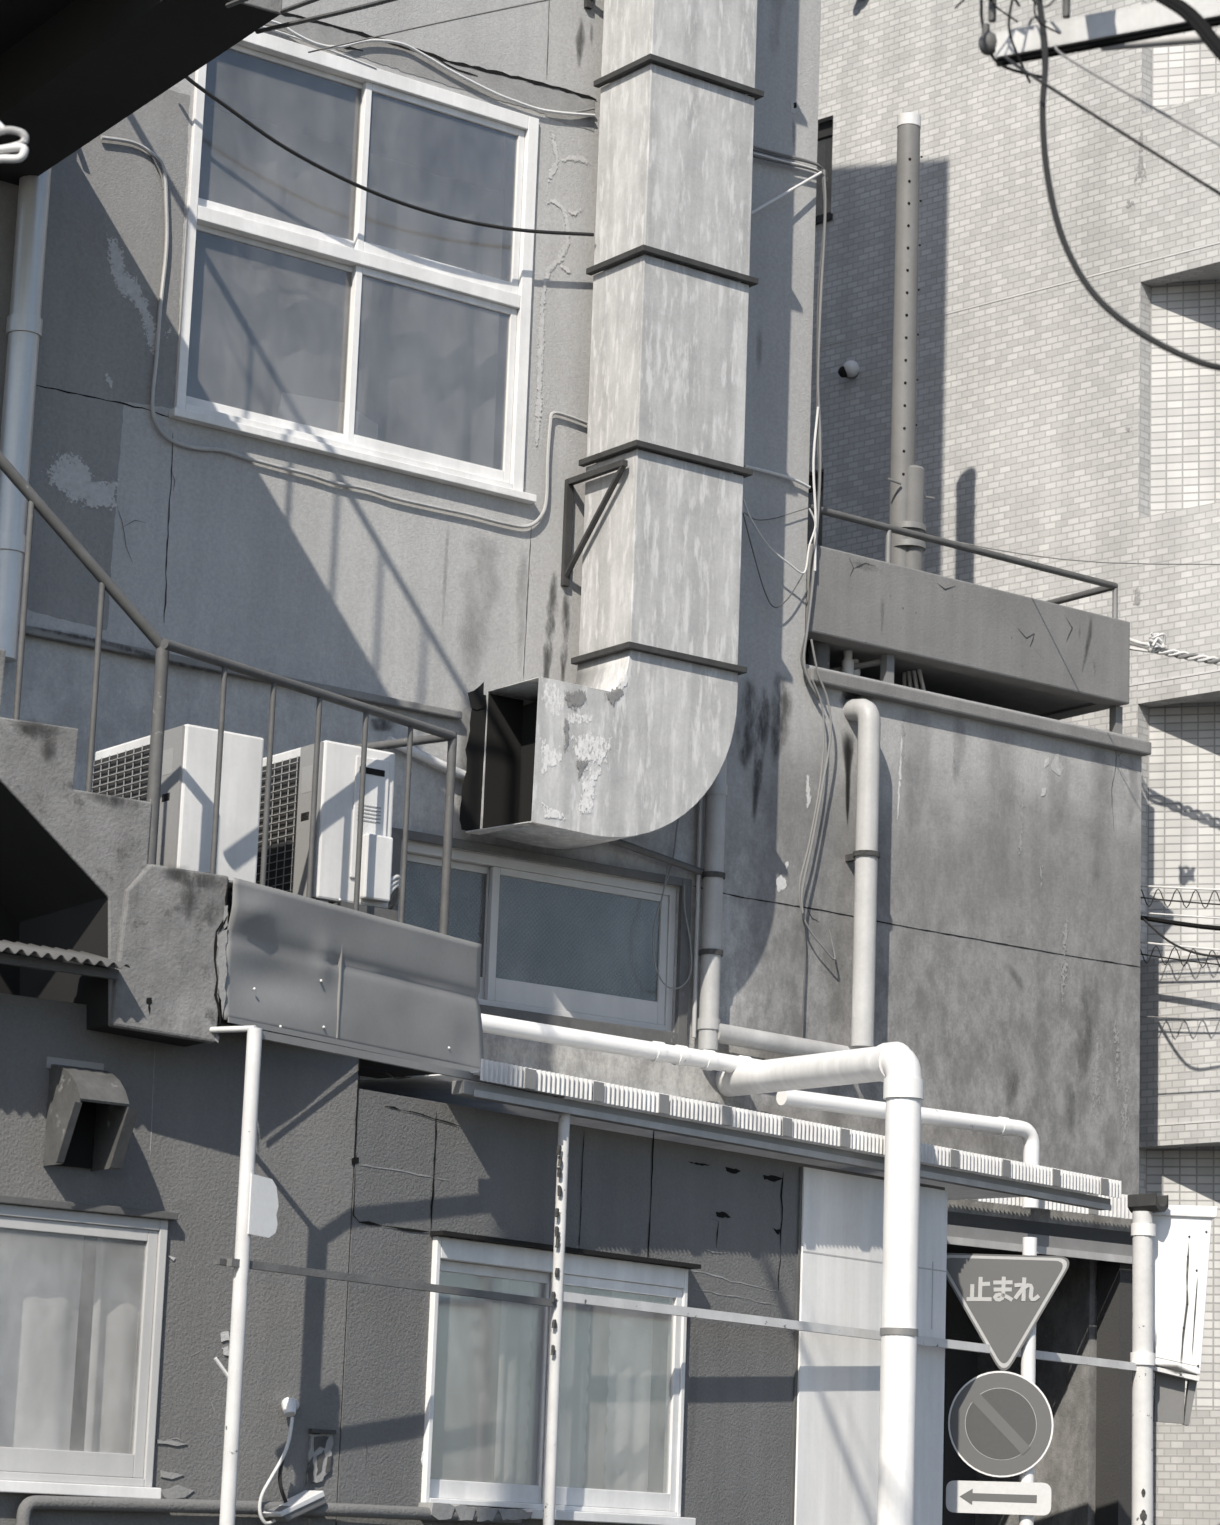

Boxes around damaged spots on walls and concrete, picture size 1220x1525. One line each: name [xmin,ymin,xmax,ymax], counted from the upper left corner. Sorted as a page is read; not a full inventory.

peeling [106,235,172,355]
peeling [81,478,120,511]
peeling [539,669,628,820]
crack [214,880,229,1034]